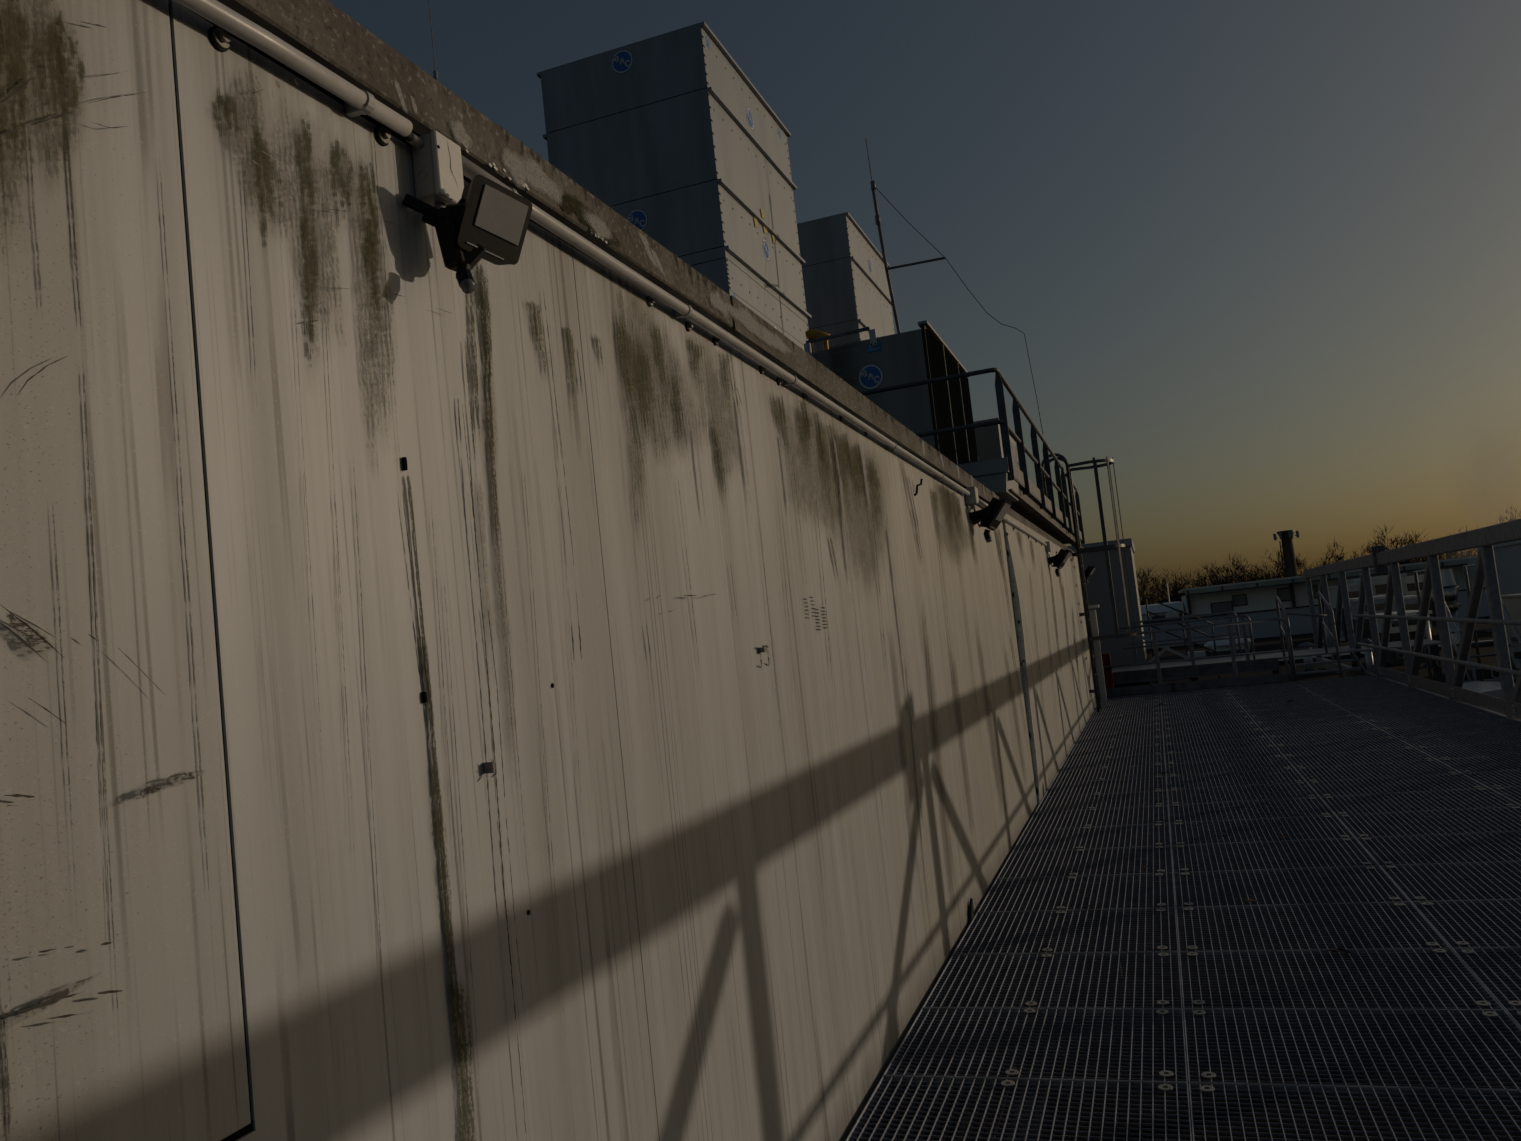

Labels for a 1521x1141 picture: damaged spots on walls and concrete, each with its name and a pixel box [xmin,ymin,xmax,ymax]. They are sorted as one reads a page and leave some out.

leakage [214,89,283,404]
leakage [53,514,72,824]
leakage [83,374,115,956]
leakage [161,180,209,888]
leakage [294,112,397,809]
leakage [526,299,583,587]
leakage [594,315,749,687]